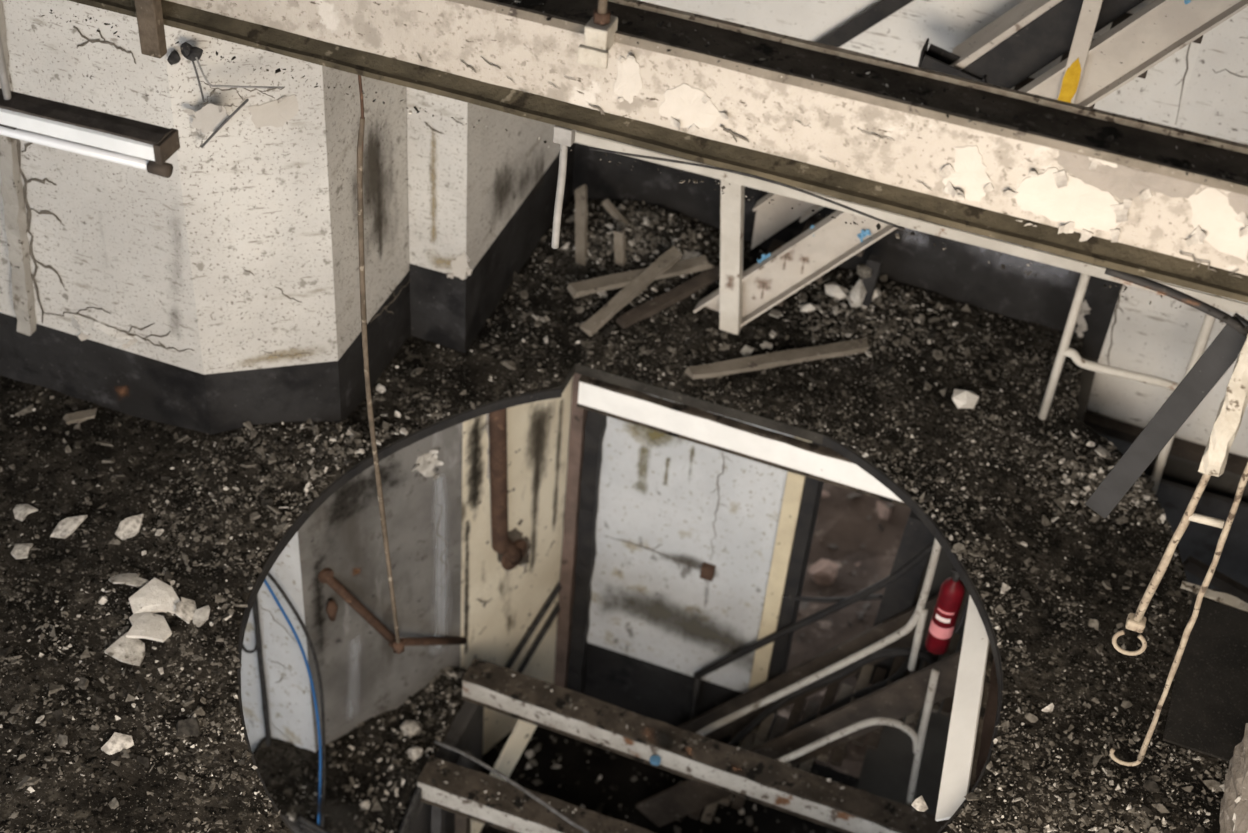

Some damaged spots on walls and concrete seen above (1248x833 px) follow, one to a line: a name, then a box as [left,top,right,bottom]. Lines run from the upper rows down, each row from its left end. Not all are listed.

crack [73,26,136,64]
crack [17,139,194,352]
leakage [356,132,386,255]
peeling [940,145,1248,266]